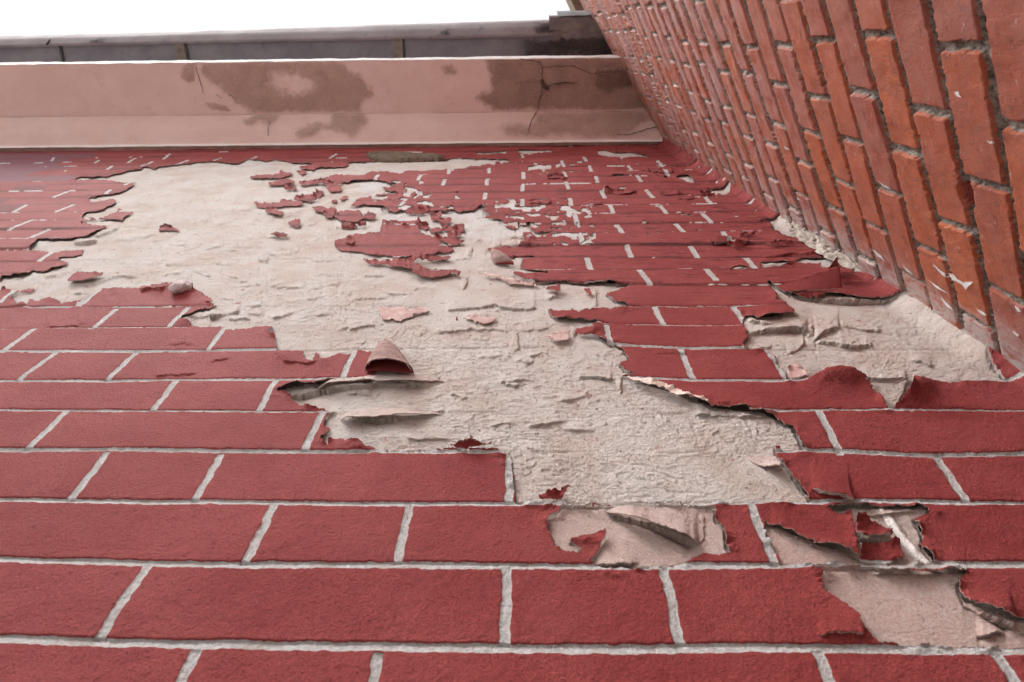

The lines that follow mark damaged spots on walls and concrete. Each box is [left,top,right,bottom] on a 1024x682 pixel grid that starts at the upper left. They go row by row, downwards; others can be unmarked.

leakage [183,62,368,135]
crack [511,58,620,135]
leakage [479,23,657,135]
spalling [960,180,975,204]
peeling [0,149,810,570]
peeling [698,198,1005,409]
peeling [763,506,1024,650]